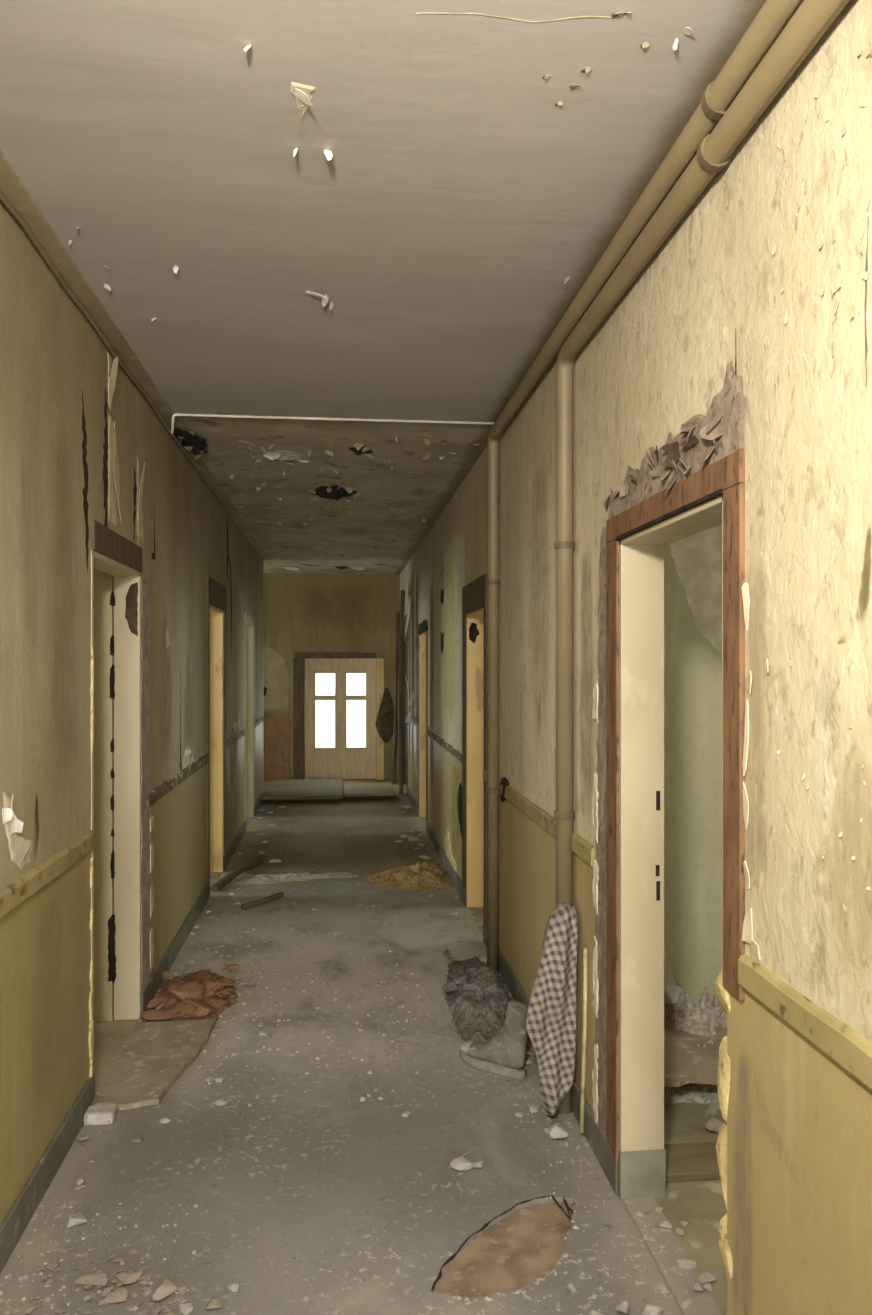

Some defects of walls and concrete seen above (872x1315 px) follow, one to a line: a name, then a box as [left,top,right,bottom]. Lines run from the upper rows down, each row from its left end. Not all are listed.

peeling [290,82,315,120]
peeling [305,291,334,310]
crack [82,389,155,572]
spalling [170,427,404,503]
peeling [2,792,32,869]
spalling [90,634,115,758]
spalling [110,574,169,993]
peeling [264,644,292,782]
spalling [592,324,769,1139]
spalling [88,909,116,1078]
spalling [677,1036,733,1292]
spalling [431,1170,579,1301]